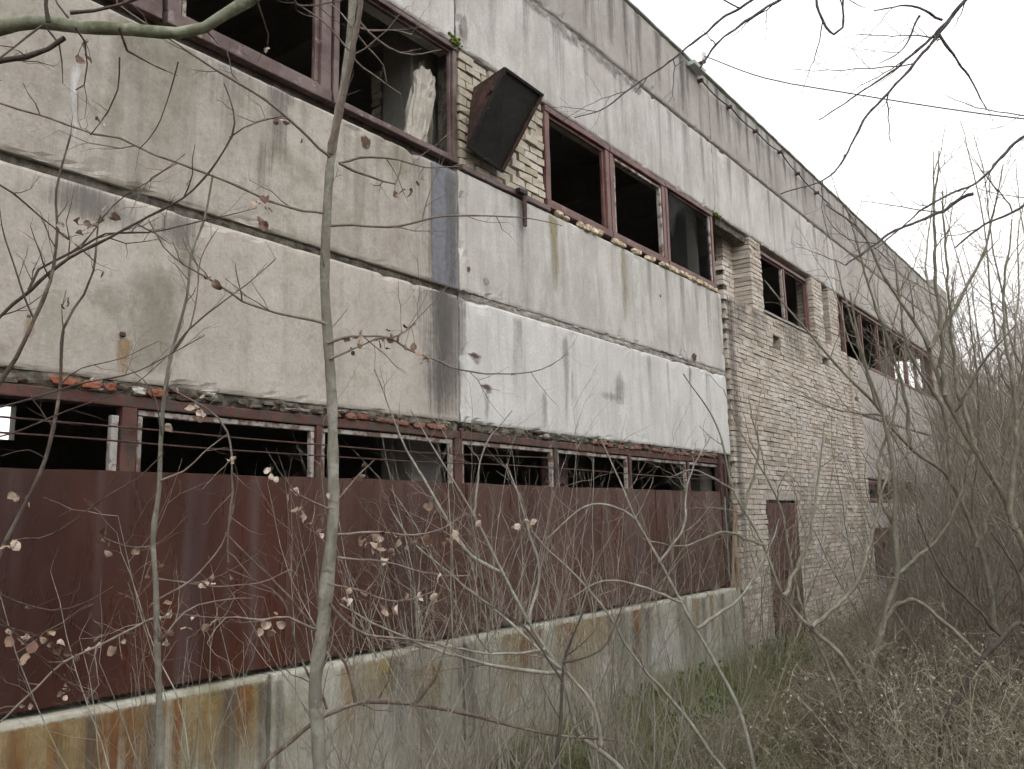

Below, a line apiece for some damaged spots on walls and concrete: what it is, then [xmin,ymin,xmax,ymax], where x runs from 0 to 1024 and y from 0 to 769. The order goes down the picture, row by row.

leakage [430,162,462,401]
rust [119,332,131,368]
spalling [0,367,725,460]
rust [501,628,543,694]